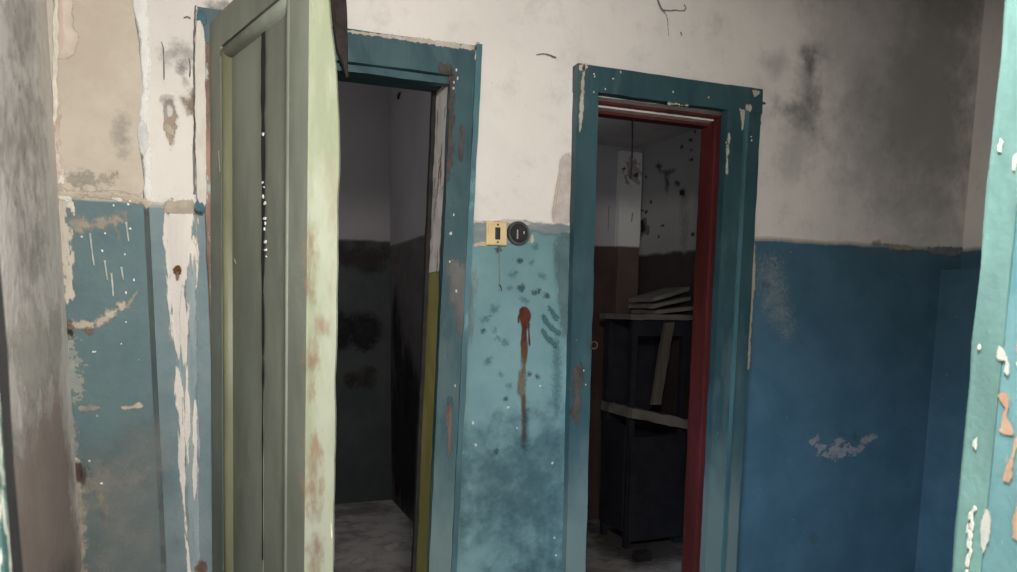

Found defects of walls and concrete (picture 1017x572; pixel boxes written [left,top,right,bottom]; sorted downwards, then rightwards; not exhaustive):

flaking render [8,0,152,463]
peeling [162,10,207,572]
corrosion [518,307,531,437]
peeling [996,346,1017,375]
leakage [14,397,167,572]
peeling [76,468,112,572]
leakage [479,432,558,527]
peeling [807,433,878,462]
peeling [965,505,991,572]
peeling [998,392,1017,483]